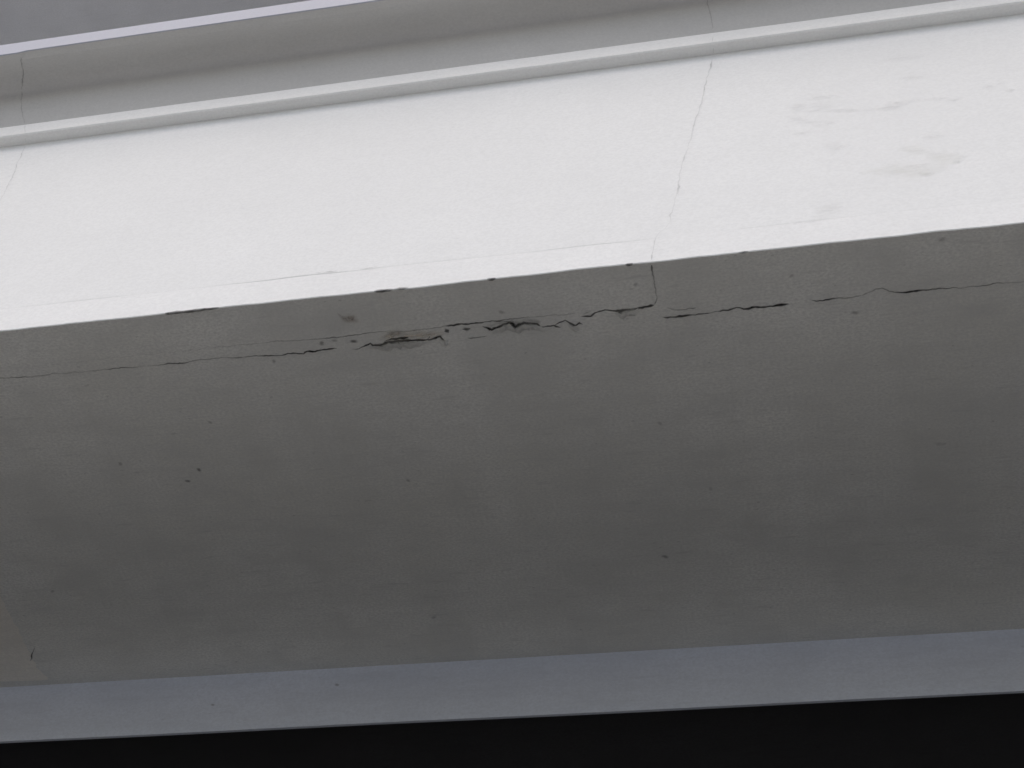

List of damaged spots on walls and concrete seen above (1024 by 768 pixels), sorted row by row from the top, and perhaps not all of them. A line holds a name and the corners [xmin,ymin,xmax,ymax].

crack [896,286,954,294]
crack [582,303,787,320]
crack [447,319,502,327]
crack [264,335,353,356]